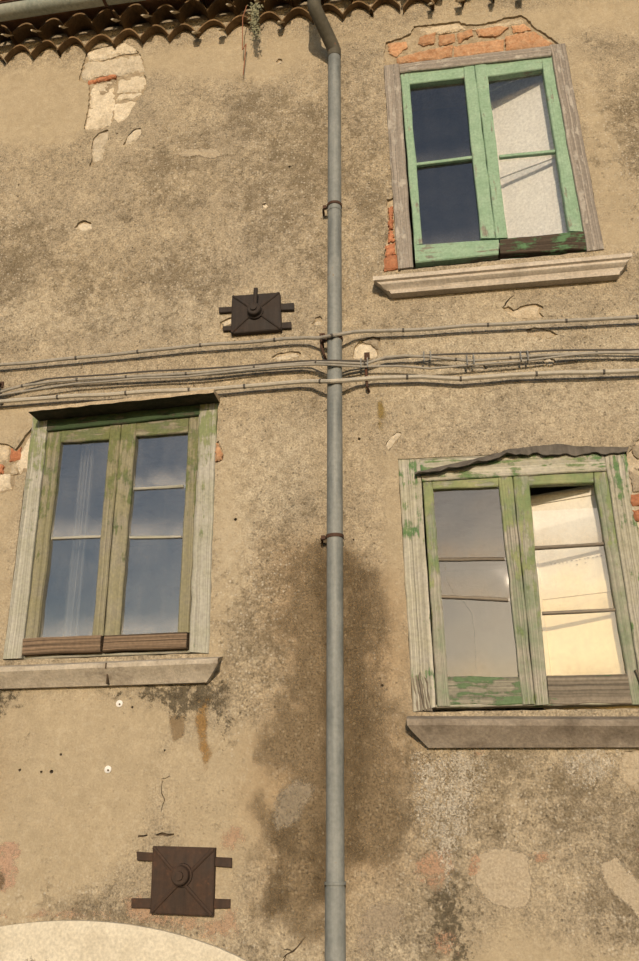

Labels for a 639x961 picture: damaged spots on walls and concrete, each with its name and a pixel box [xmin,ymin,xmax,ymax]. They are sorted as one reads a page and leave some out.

spalling [384,17,556,72]
spalling [80,43,147,166]
spalling [0,433,31,493]
spalling [627,440,639,534]
damp [170,716,184,740]
damp [253,540,327,942]
damp [343,554,485,891]
spalling [619,750,639,793]
crack [139,830,174,838]